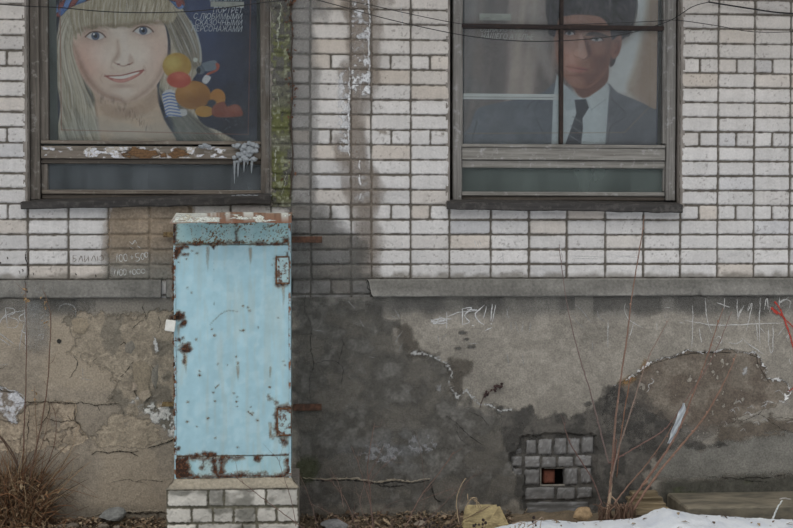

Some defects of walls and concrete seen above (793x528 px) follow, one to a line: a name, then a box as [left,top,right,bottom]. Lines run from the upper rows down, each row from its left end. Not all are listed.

peeling [83,147,227,159]
damp [275,0,793,514]
flaking render [0,308,174,454]
crack [31,400,123,411]
flaking render [613,349,793,443]
hole [541,468,563,484]
crack [303,477,441,502]